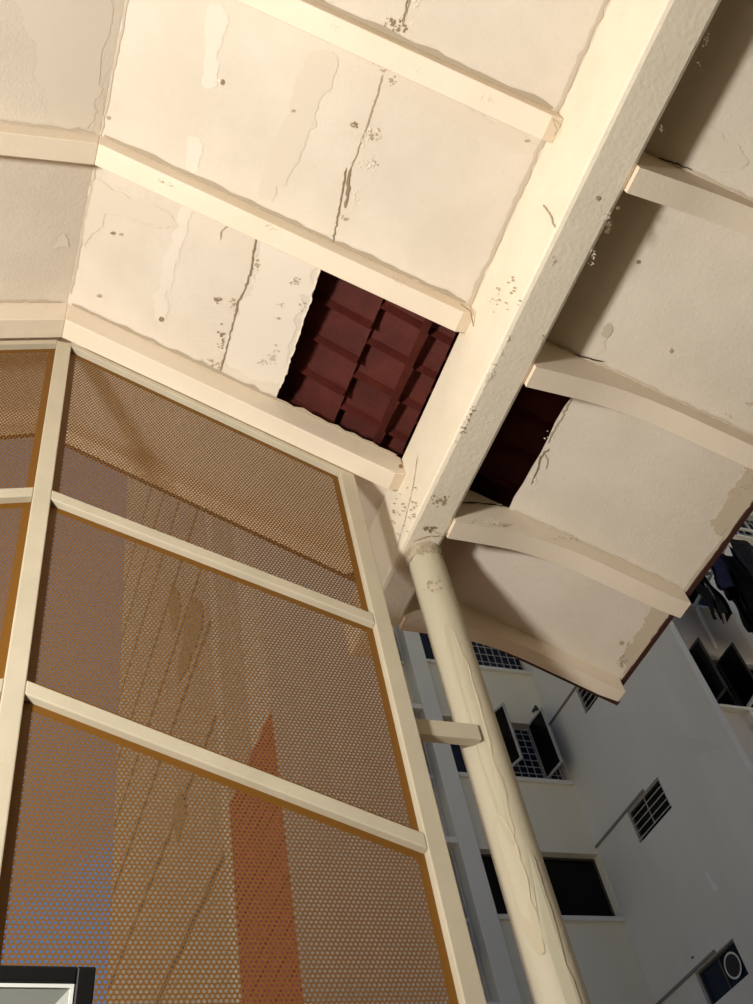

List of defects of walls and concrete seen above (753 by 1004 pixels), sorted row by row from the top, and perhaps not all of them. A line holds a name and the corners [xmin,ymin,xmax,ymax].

crack [402,0,410,26]
crack [332,75,383,241]
crack [220,239,257,370]